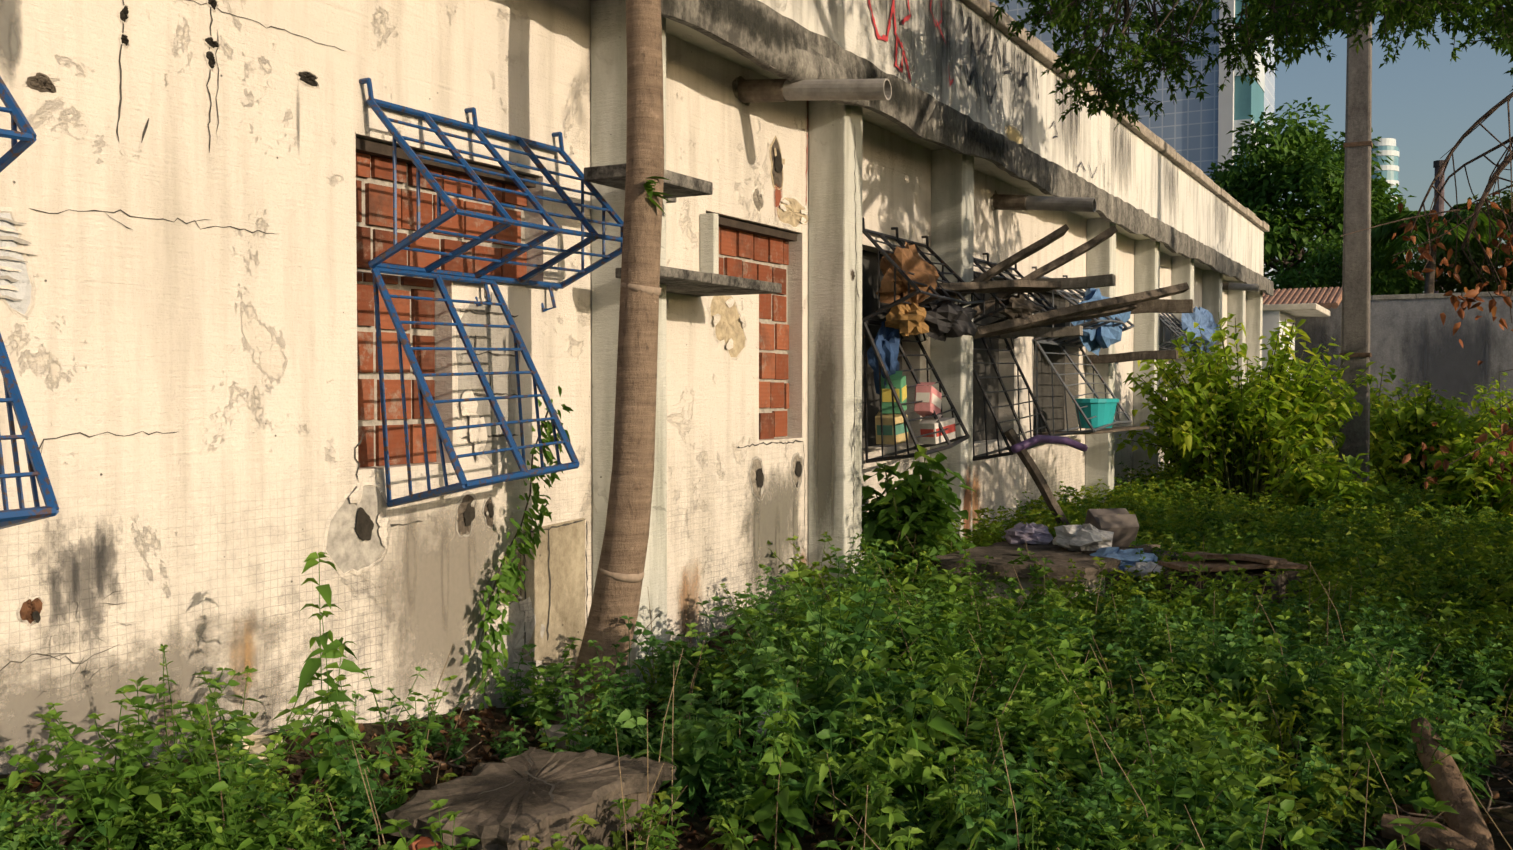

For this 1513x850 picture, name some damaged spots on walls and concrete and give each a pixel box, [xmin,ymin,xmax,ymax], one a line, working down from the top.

spalling [26,72,56,93]
crack [116,0,149,143]
crack [188,0,344,153]
spalling [296,69,319,89]
crack [30,208,275,234]
crack [39,431,176,453]
spalling [322,434,423,577]
spalling [455,491,495,537]
spalling [16,595,45,627]
leakage [50,543,116,634]